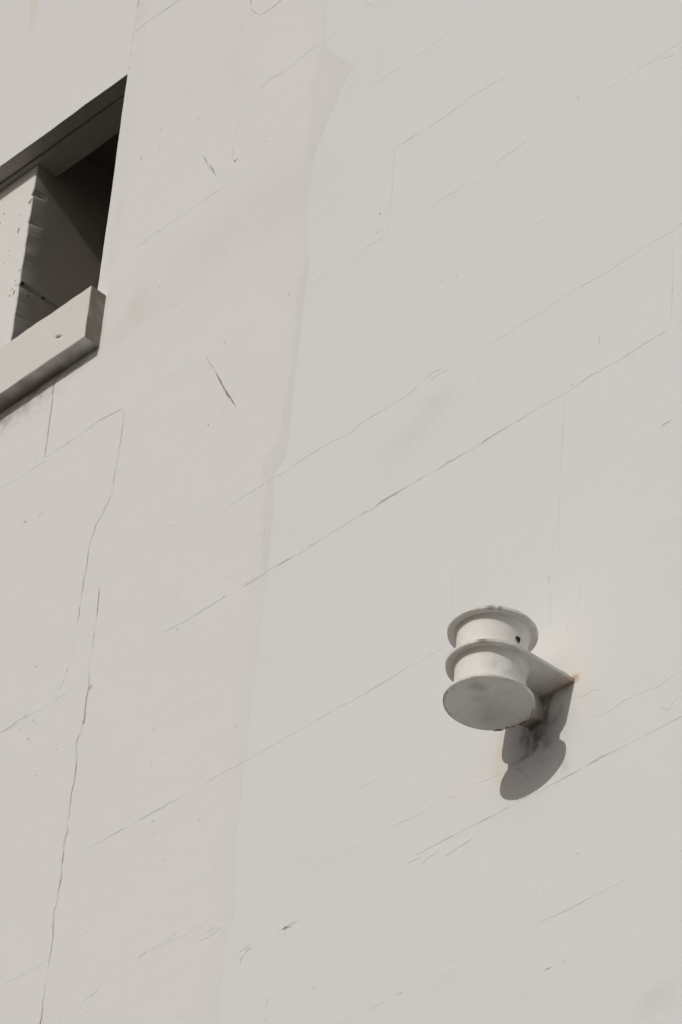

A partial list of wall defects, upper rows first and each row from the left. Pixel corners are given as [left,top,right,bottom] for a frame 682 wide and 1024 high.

crack [167,223,682,631]
crack [0,367,450,1024]
crack [389,670,682,863]